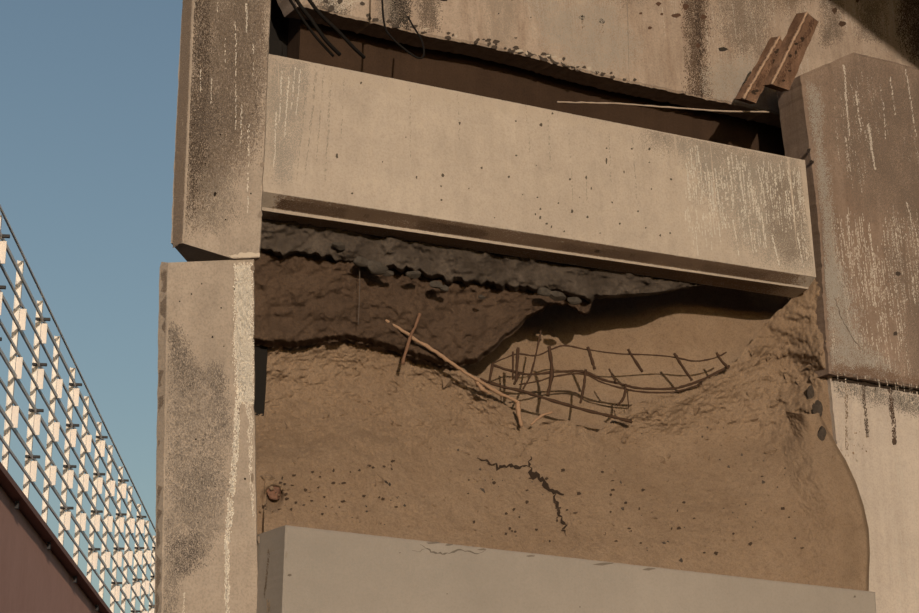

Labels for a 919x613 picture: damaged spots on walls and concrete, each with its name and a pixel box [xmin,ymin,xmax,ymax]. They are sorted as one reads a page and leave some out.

spalling [229,211,704,305]
leakage [173,0,919,418]
leakage [156,262,255,613]
crack [478,457,567,535]